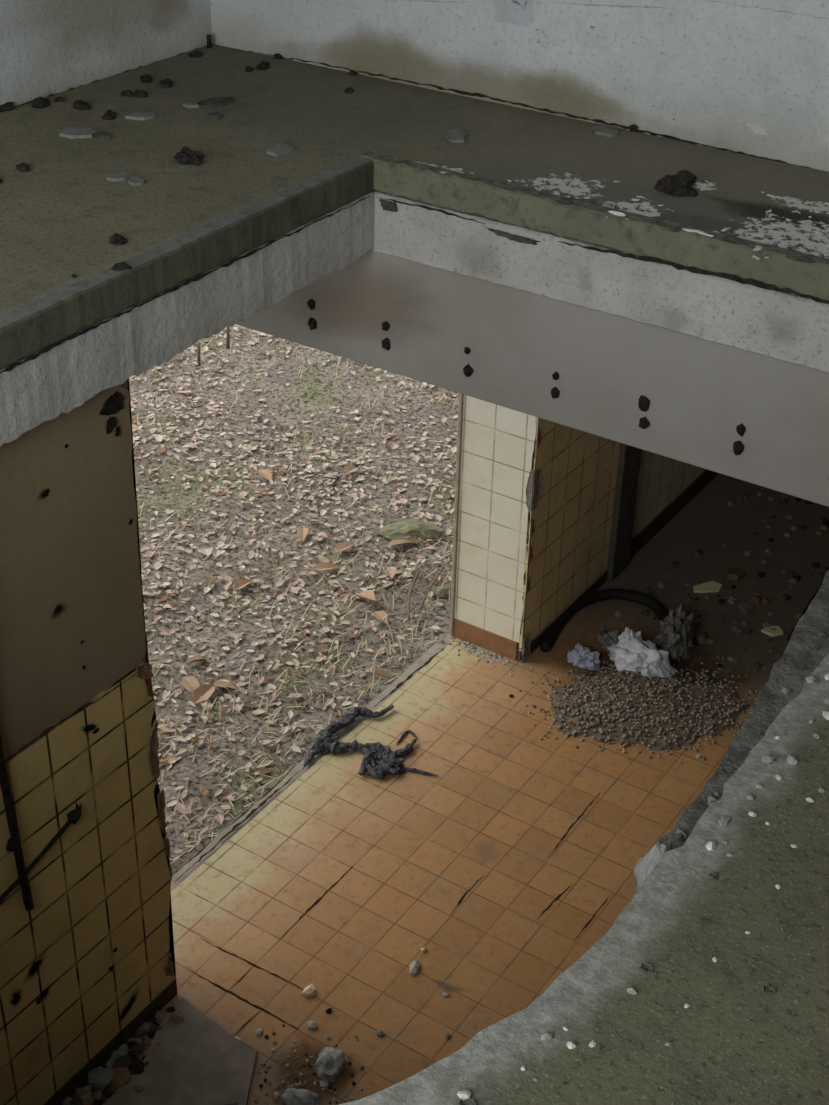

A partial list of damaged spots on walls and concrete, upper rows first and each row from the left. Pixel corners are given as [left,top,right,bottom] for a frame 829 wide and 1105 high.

leakage [350,38,587,114]
spalling [379,199,398,212]
spalling [487,228,540,245]
peeling [507,172,829,263]
crack [549,793,600,856]
crack [280,866,353,939]
crack [537,885,571,919]
crack [576,896,609,939]
crack [194,938,304,1033]